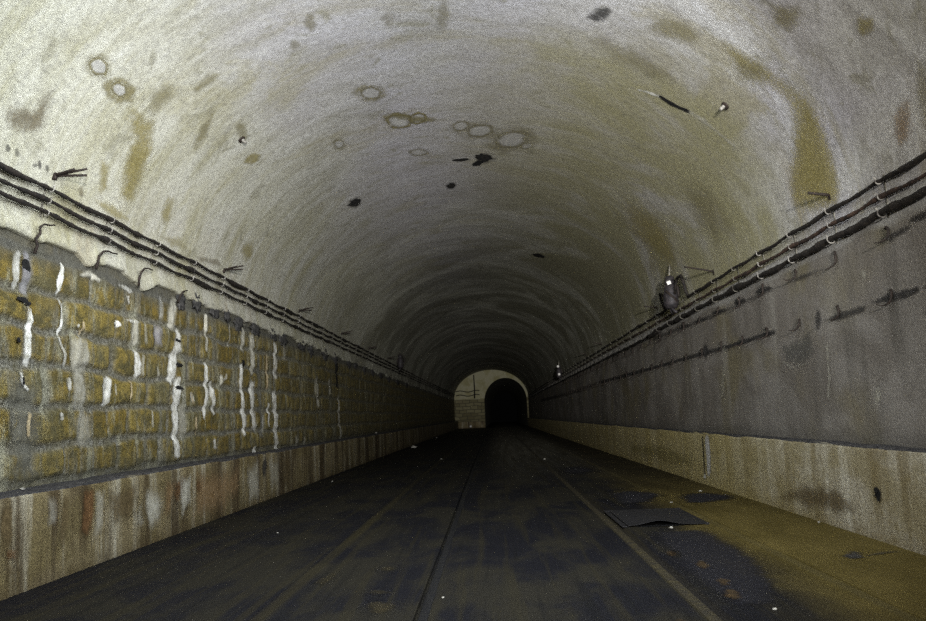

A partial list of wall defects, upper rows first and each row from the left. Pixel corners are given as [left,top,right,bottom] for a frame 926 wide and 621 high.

damp [89,57,135,102]
damp [125,114,151,196]
damp [383,112,433,129]
damp [501,134,531,148]
damp [12,252,35,466]
damp [56,263,89,407]
damp [102,377,117,406]
damp [115,320,145,401]
damp [154,299,227,458]
damp [239,324,278,449]